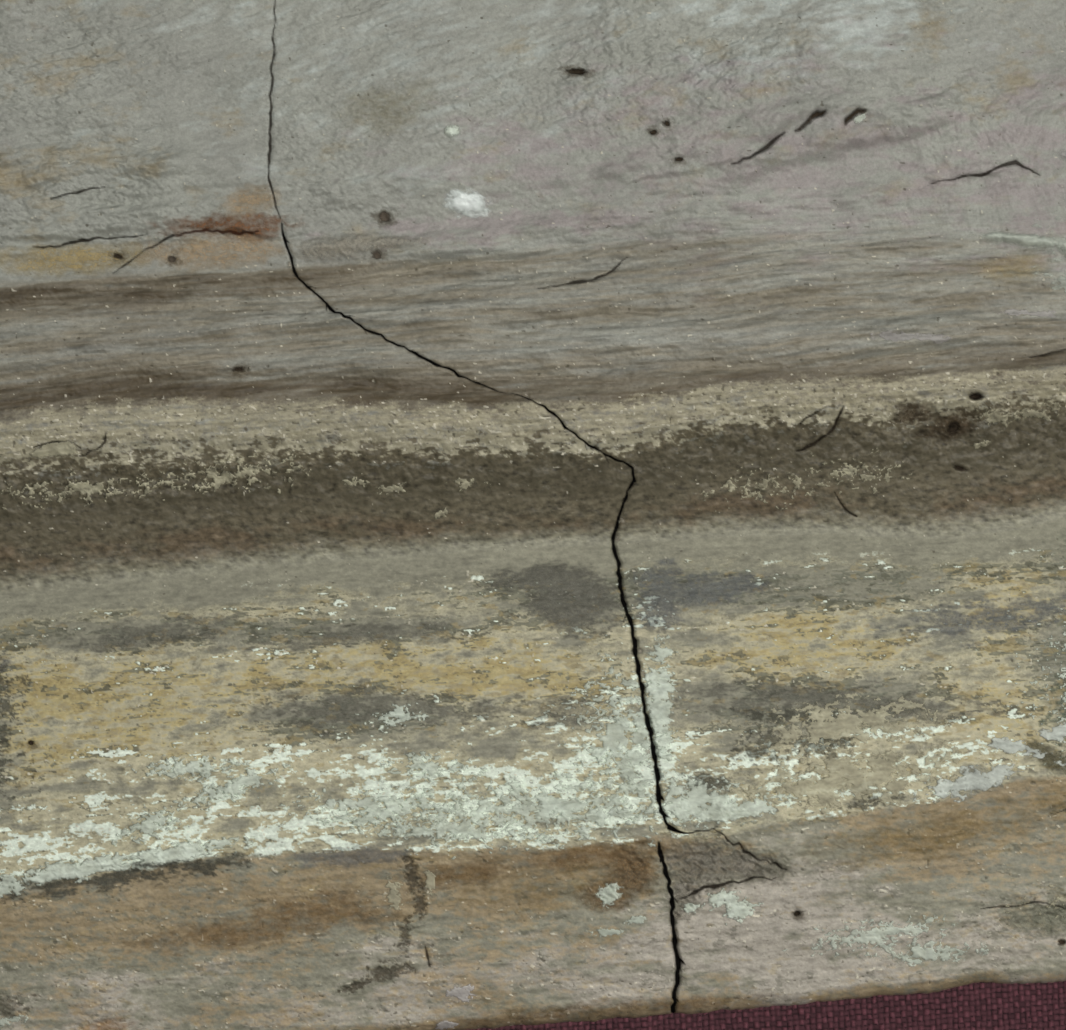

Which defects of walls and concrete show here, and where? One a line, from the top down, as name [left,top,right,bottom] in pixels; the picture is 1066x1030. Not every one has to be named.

corrosion [155,194,281,264]
crack [35,0,718,1013]
water stain [491,565,623,638]
water stain [905,599,1063,635]
water stain [0,660,31,766]
water stain [730,690,853,770]
water stain [694,773,736,789]
water stain [10,852,250,903]